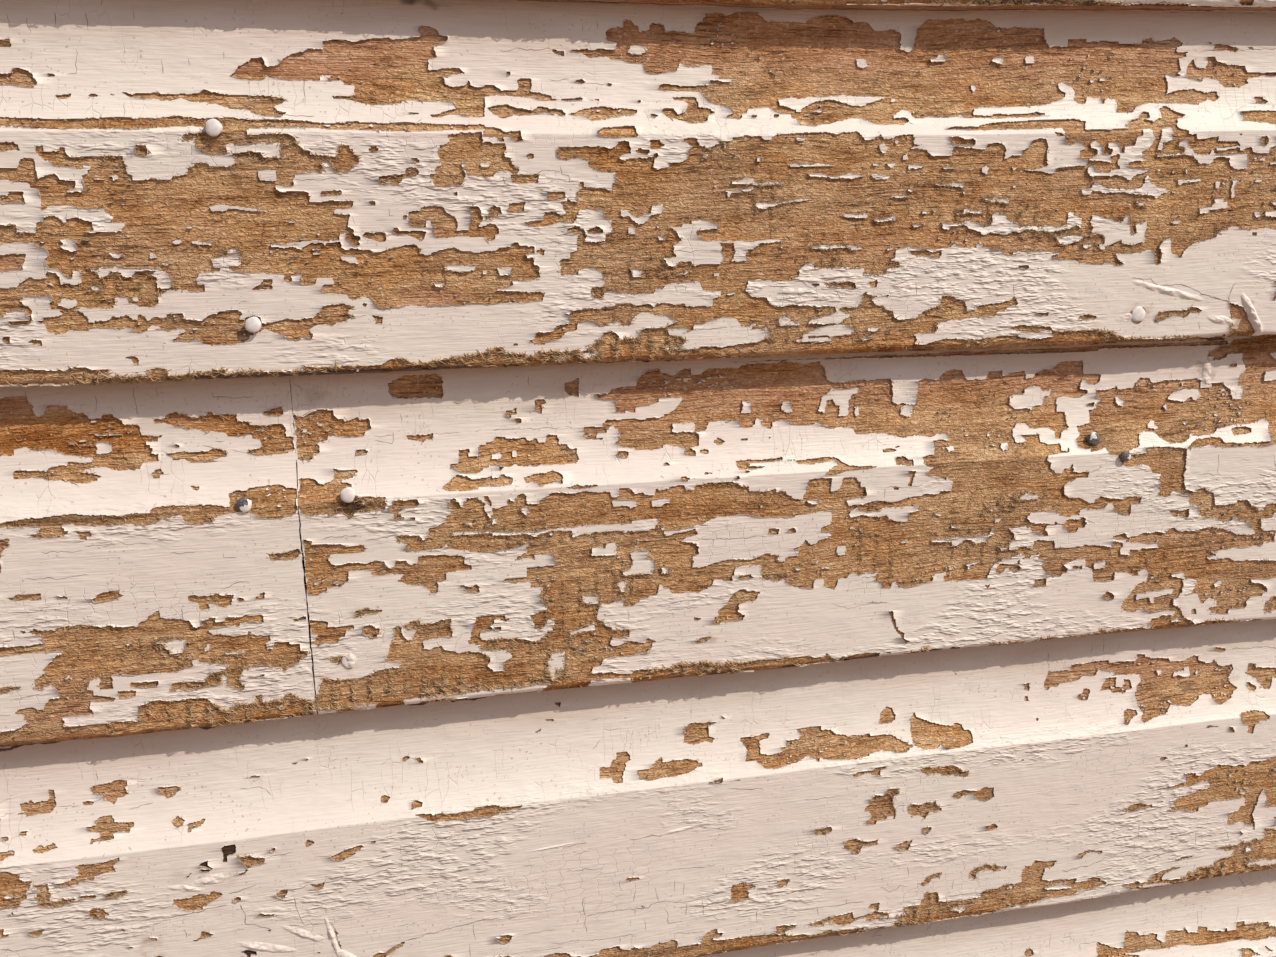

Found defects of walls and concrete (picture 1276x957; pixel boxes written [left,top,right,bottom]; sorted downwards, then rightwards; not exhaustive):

peeling [0,0,1276,745]
peeling [20,790,56,816]
peeling [87,780,134,842]
peeling [418,805,520,822]
peeling [599,751,702,783]
peeling [740,707,973,777]
peeling [865,789,939,824]
peeling [921,766,994,800]
peeling [1124,757,1276,889]
peeling [0,850,120,907]
peeling [545,860,1105,957]
peeling [1096,921,1276,957]